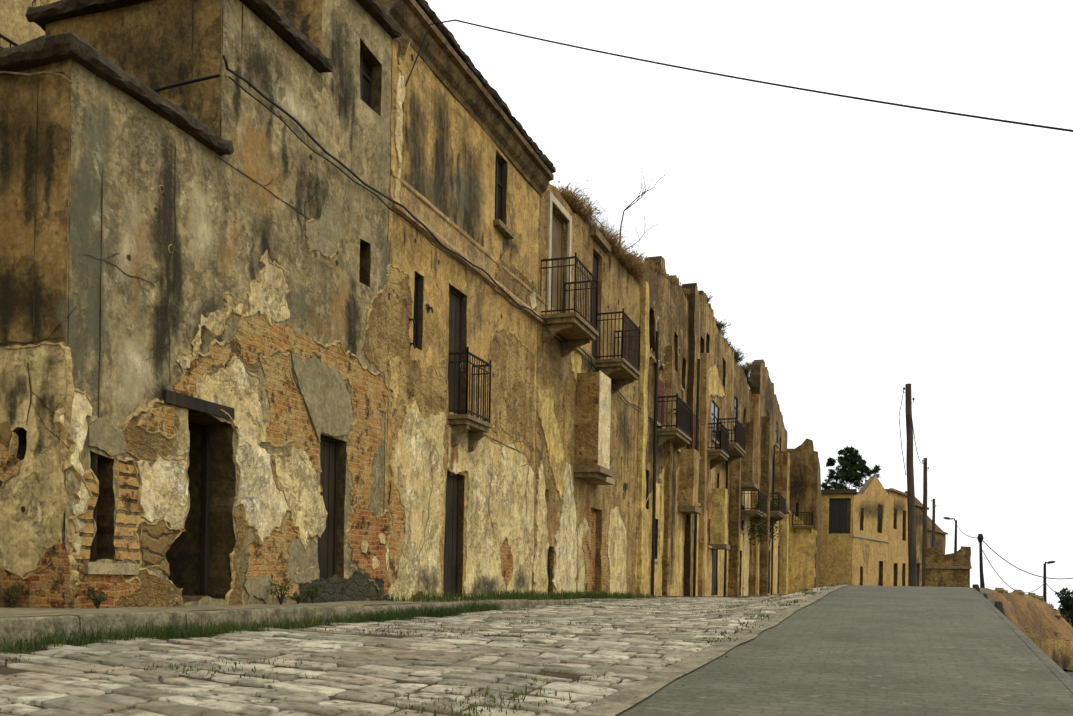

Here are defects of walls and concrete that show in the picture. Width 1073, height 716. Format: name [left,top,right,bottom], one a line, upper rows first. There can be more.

flaking render [0,264,448,617]